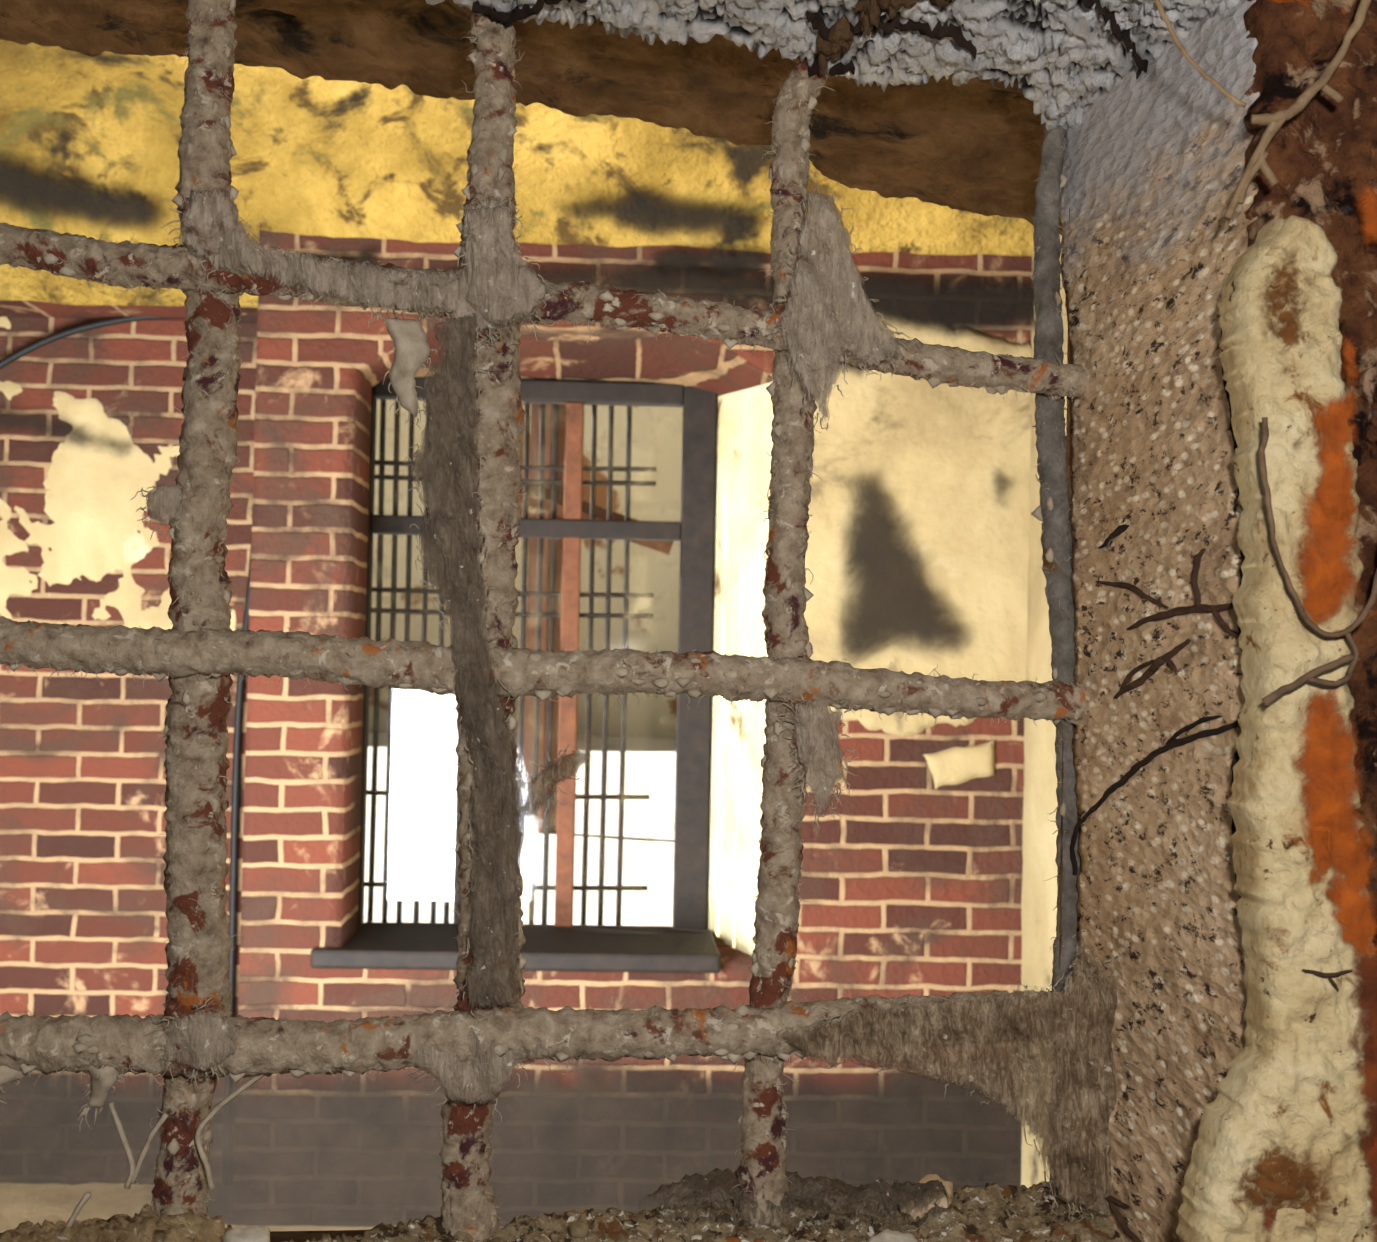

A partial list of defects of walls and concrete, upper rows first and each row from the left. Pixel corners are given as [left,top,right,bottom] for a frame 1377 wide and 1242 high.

corrosion [1360,188,1377,241]
peeling [0,317,11,329]
corrosion [1343,342,1357,377]
peeling [0,381,23,400]
peeling [0,391,180,630]
corrosion [1297,394,1357,624]
corrosion [1295,690,1377,1240]
corrosion [1264,1206,1275,1230]